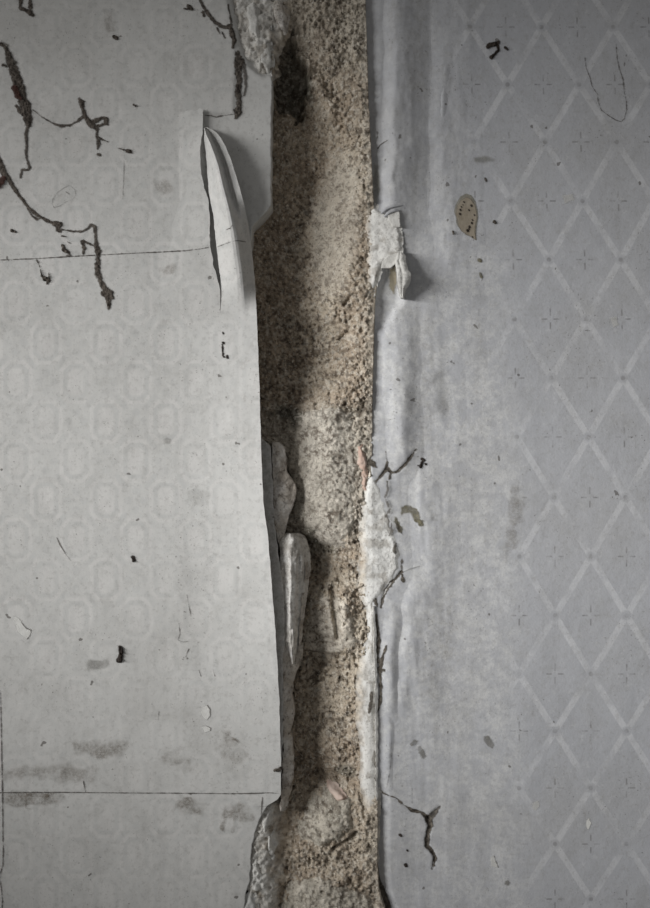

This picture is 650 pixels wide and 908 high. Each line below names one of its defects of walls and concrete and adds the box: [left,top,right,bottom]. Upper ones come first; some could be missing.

crack [18,0,34,17]
crack [199,0,247,119]
crack [0,42,245,310]
flaking render [233,0,411,908]
crack [367,449,416,483]
crack [368,570,405,714]
crack [374,755,440,870]